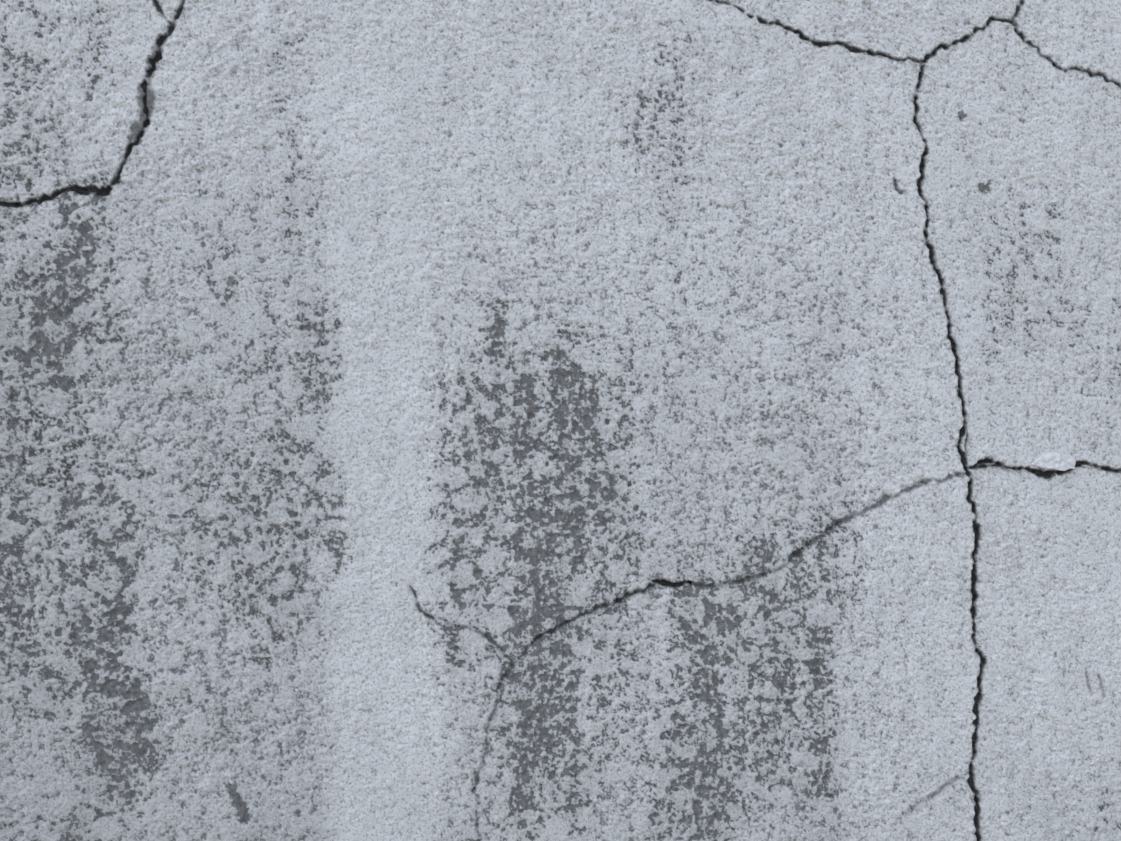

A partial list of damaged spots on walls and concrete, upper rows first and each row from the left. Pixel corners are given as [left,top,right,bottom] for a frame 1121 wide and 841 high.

leakage [15,1,55,38]
crack [0,0,184,208]
leakage [74,8,116,101]
leakage [204,248,238,306]
leakage [245,314,280,389]
leakage [296,300,342,410]
leakage [0,27,166,841]
crack [472,0,1121,841]
leakage [181,418,353,668]
crack [412,589,435,619]
leakage [426,300,863,841]
leakage [225,784,249,824]